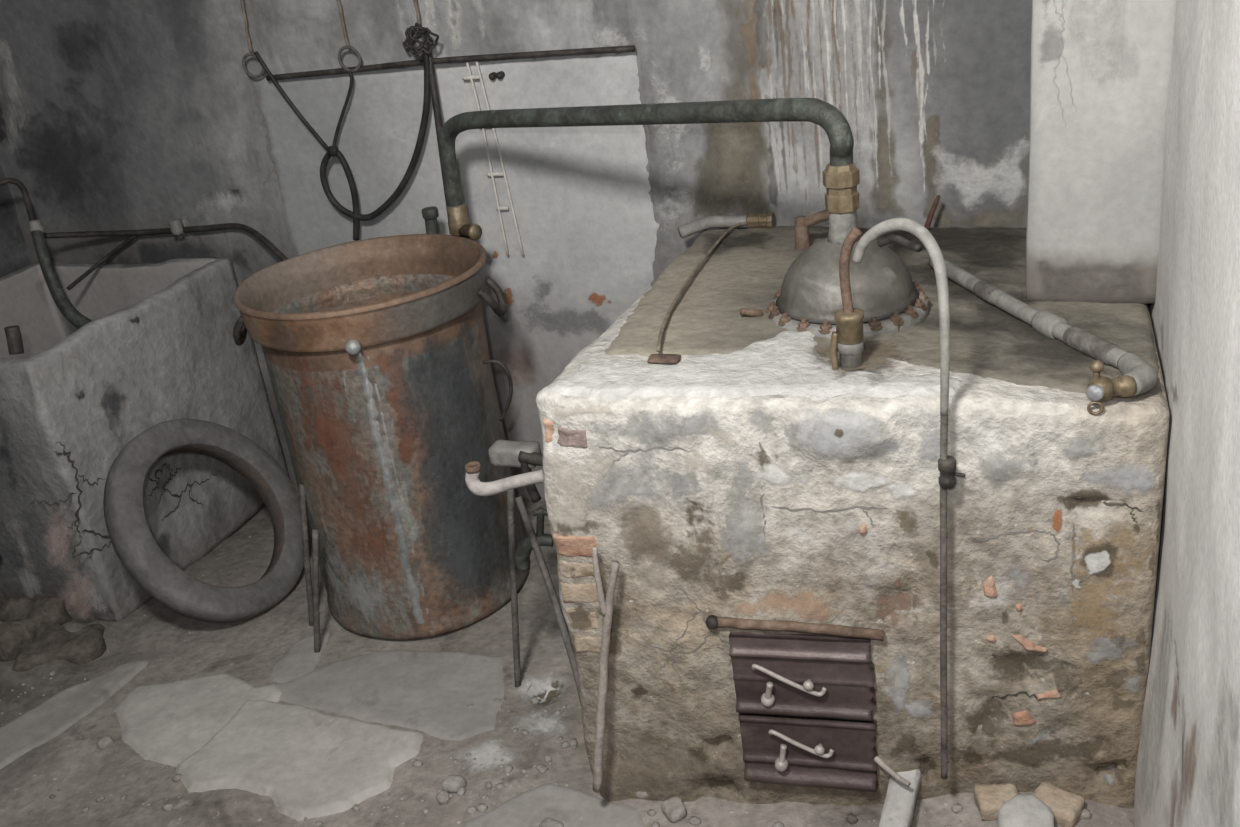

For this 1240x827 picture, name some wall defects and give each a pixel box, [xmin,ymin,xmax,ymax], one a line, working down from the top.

leakage [592,27,628,46]
leakage [652,75,679,103]
leakage [727,0,900,213]
leakage [882,0,1023,266]
leakage [654,122,780,220]
peeling [933,140,1028,207]
leakage [711,233,765,250]
crack [148,463,221,521]
peeling [546,457,586,529]
crack [1103,501,1144,522]
peeling [1072,551,1110,588]